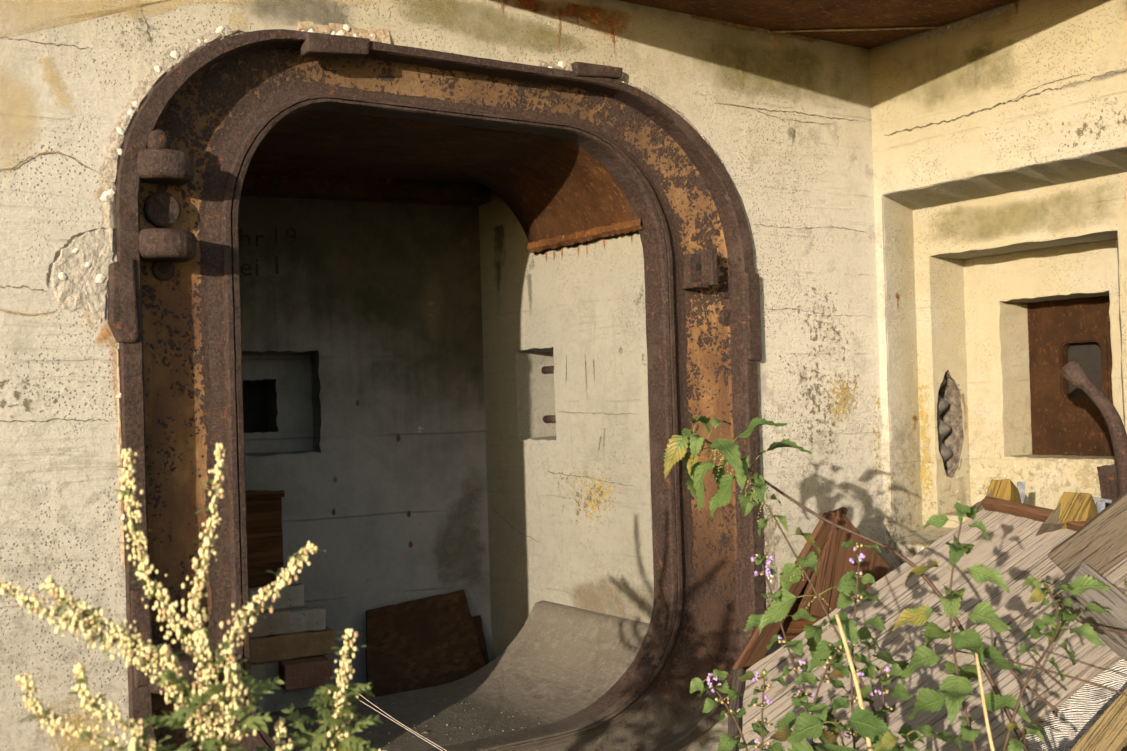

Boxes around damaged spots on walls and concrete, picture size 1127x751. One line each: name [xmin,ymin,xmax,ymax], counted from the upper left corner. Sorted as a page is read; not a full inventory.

corrosion [501,0,628,44]
crack [0,36,89,49]
crack [718,103,845,124]
crack [886,69,1127,136]
crack [0,151,98,173]
spalling [46,26,241,323]
crack [0,285,55,316]
crack [2,416,112,424]
spalling [938,370,964,478]